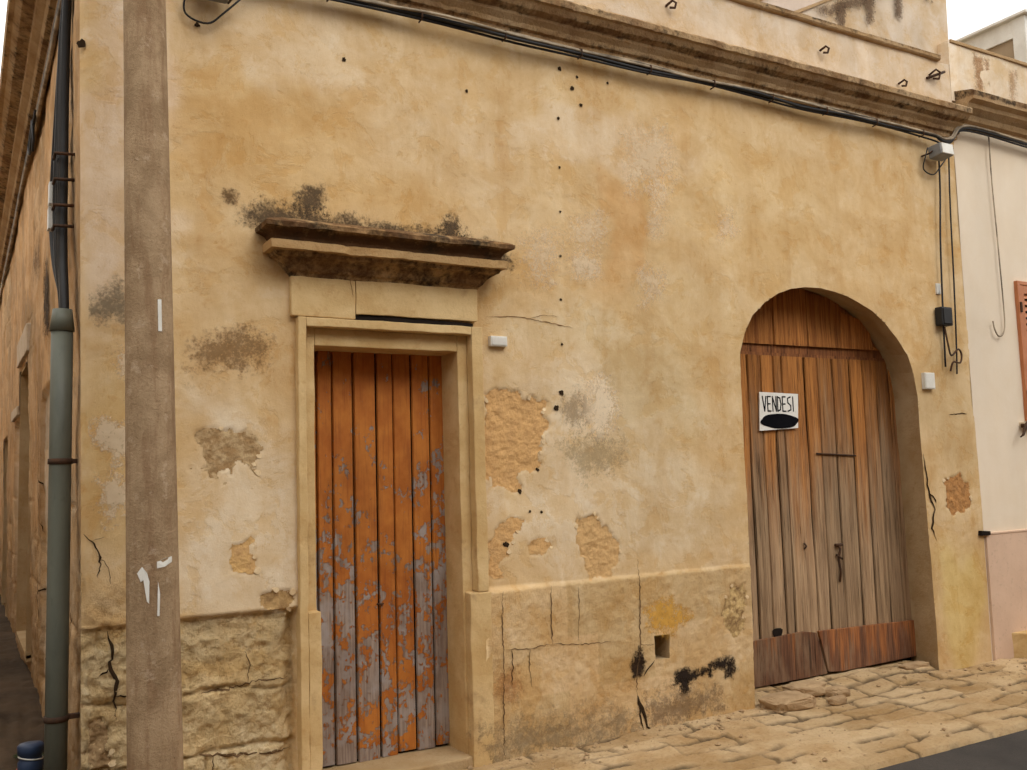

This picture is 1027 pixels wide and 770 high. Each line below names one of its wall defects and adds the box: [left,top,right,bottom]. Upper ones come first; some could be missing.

damp [223,185,467,238]
damp [90,280,125,322]
damp [191,326,267,372]
crack [486,315,572,328]
peeling [190,427,263,485]
peeling [484,388,564,494]
spalling [942,472,972,515]
peeling [229,536,261,575]
peeling [488,510,543,579]
peeling [574,512,622,581]
crack [69,535,111,644]
crack [100,631,126,717]